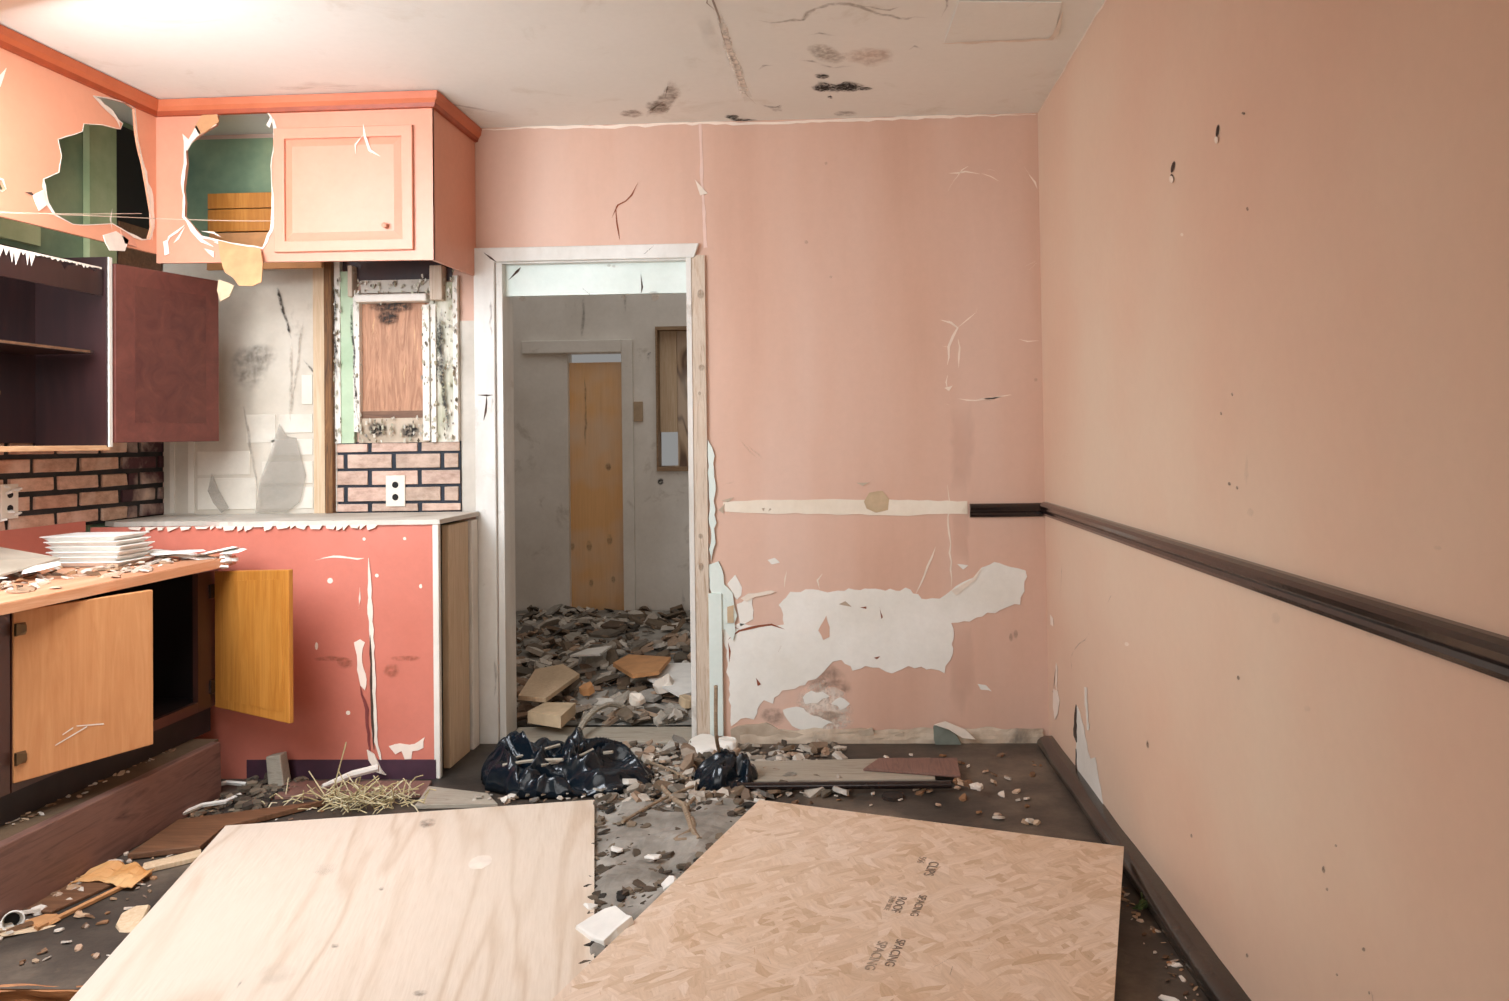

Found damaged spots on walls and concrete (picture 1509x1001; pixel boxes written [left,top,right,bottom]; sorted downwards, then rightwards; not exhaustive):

peeling [182,114,219,151]
crack [706,0,747,95]
leakage [815,74,870,98]
peeling [333,270,458,443]
flaking render [707,441,1027,743]
peeling [354,639,367,690]
peeling [1052,664,1103,804]